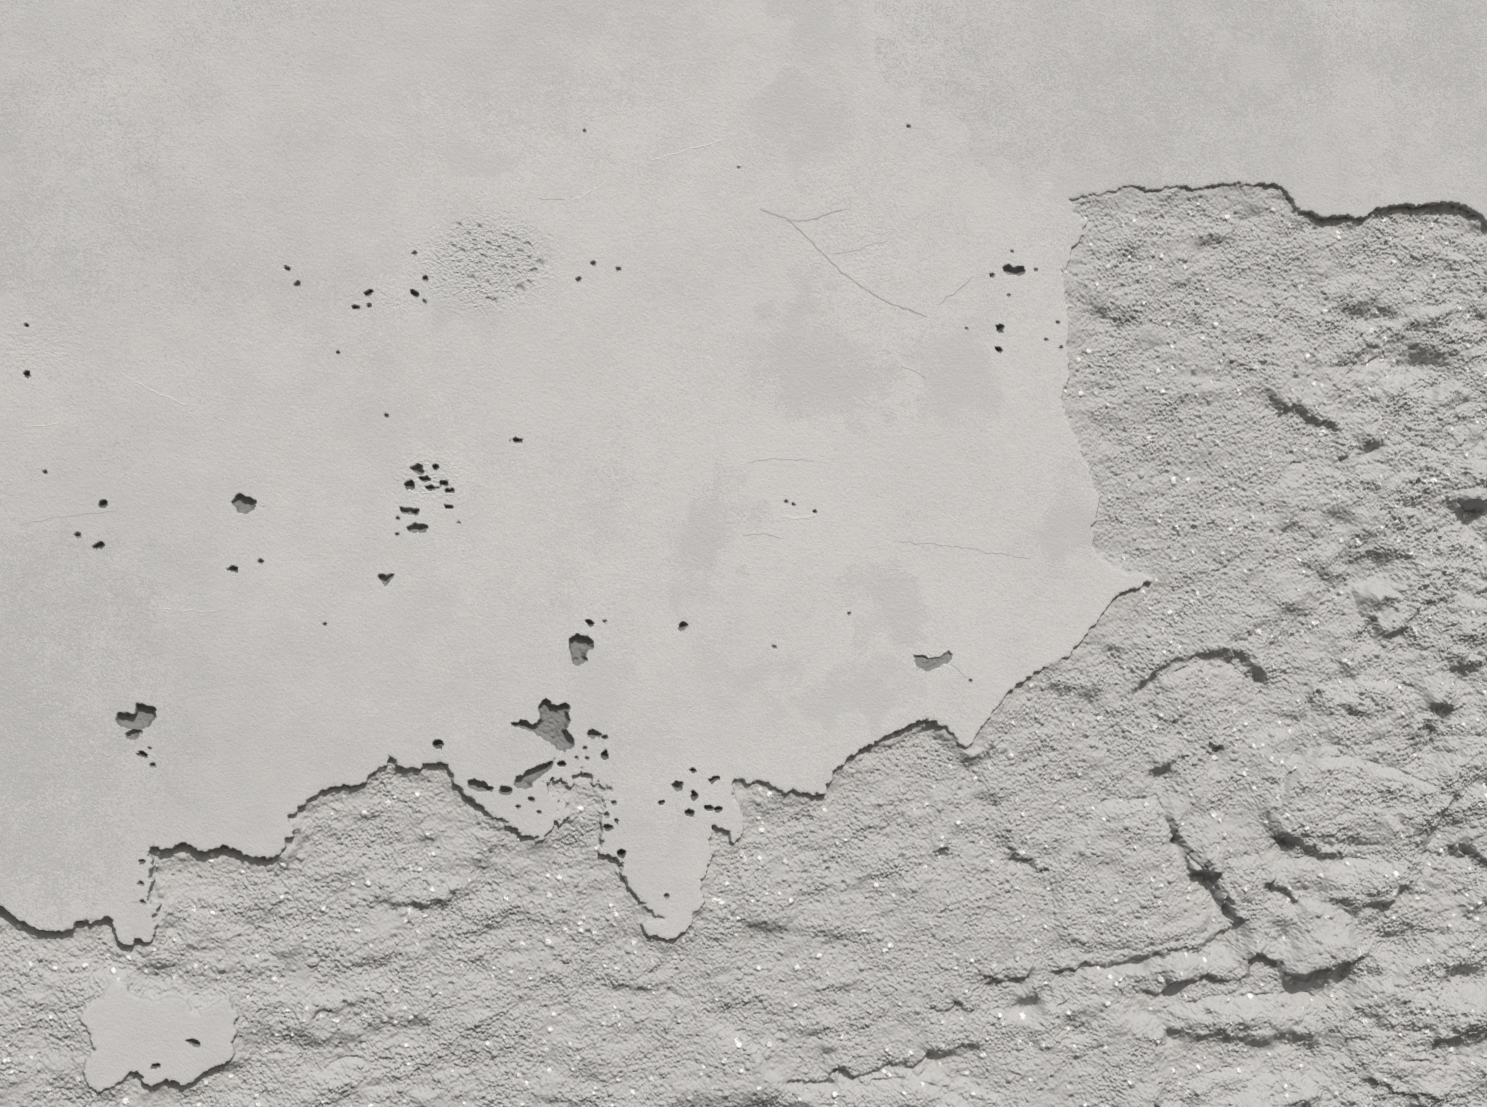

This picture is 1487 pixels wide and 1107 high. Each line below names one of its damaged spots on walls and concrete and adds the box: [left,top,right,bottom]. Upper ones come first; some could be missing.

spalling [989,251,1039,278]
crack [761,209,973,379]
hole [232,494,257,515]
hole [395,464,461,537]
spalling [1358,442,1467,512]
hole [569,620,607,666]
hole [116,704,157,769]
spalling [511,699,575,753]
hole [468,779,494,792]
hole [499,758,566,795]
hole [672,768,723,817]
spalling [1344,1038,1440,1080]